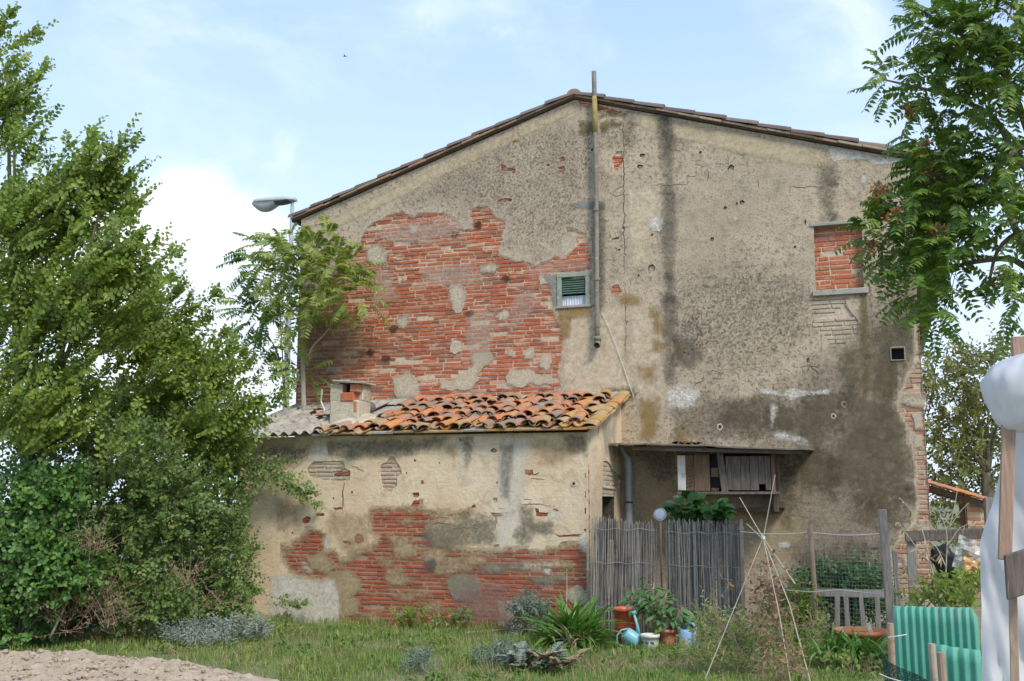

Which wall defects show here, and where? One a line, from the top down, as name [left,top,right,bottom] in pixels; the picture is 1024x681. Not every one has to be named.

peeling [296,198,594,416]
peeling [280,456,620,632]
water stain [498,437,528,545]
spalling [612,151,623,170]
crack [611,122,649,358]
efflorescence [667,387,699,407]
water stain [719,284,915,584]
peeling [890,322,935,602]